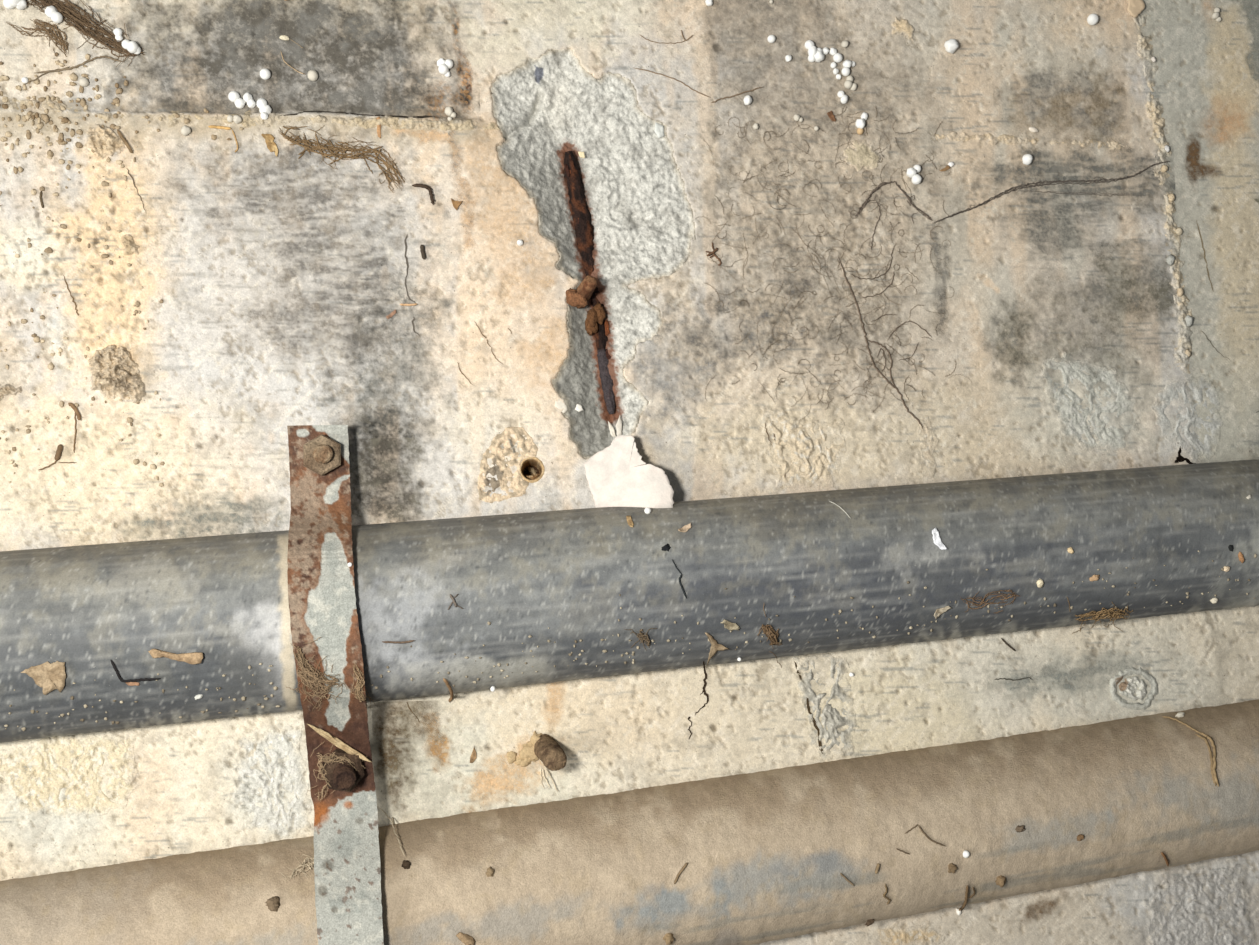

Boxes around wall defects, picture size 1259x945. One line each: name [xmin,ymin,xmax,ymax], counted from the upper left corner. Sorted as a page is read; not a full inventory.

leakage [111,0,480,116]
leakage [1025,75,1120,140]
leakage [1186,139,1214,180]
leakage [994,148,1175,252]
leakage [237,147,427,522]
corrosion [566,288,606,336]
spalling [491,48,696,508]
leakage [993,312,1031,365]
leakage [1076,257,1174,333]
leakage [137,497,269,537]
crack [688,661,709,739]